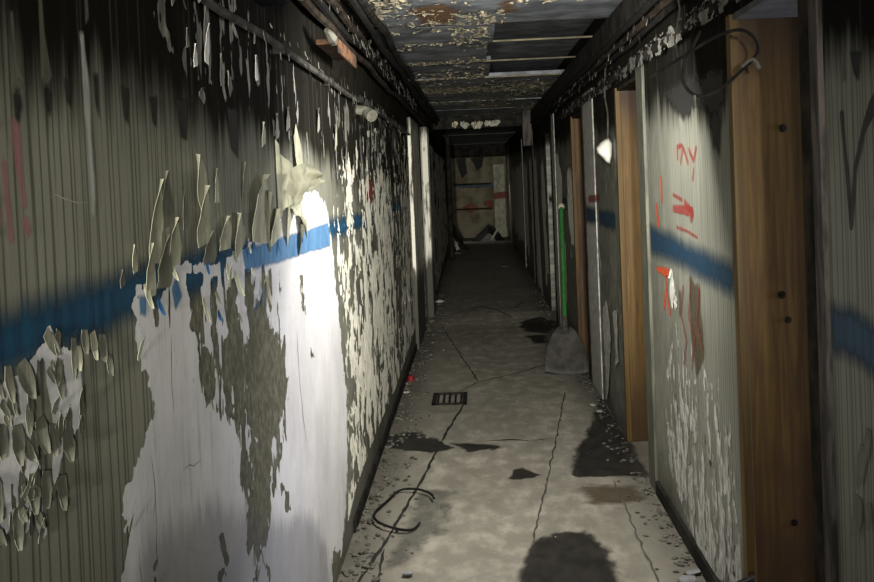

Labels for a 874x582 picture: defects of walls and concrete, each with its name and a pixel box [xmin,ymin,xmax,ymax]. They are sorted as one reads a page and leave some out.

peeling [367,0,559,95]
peeling [452,120,501,129]
peeling [120,0,415,582]
crack [357,302,545,582]
crack [488,392,565,548]
water stain [572,399,649,503]
water stain [520,532,616,582]
crack [614,481,659,582]